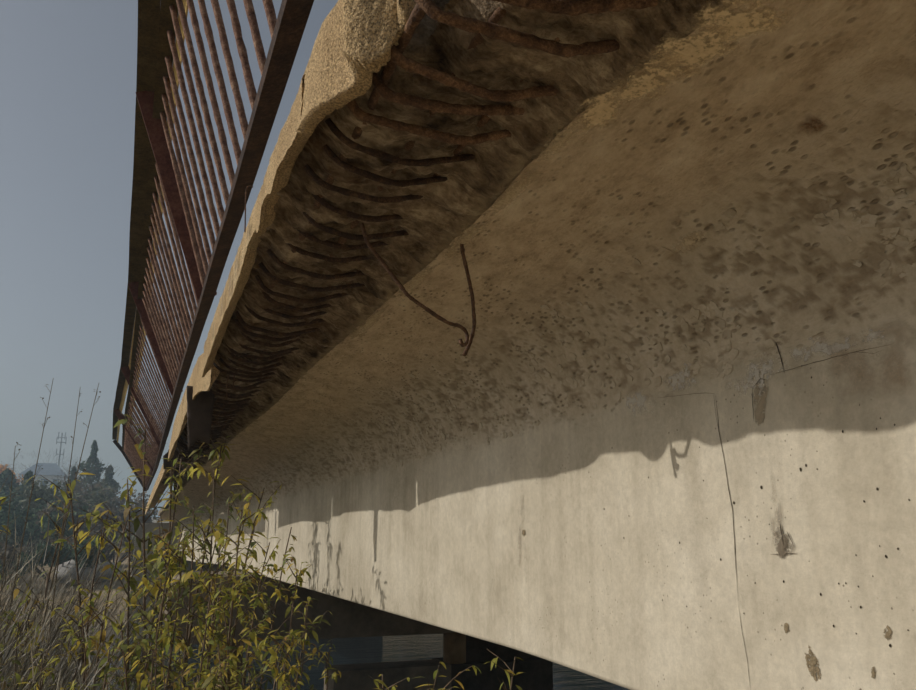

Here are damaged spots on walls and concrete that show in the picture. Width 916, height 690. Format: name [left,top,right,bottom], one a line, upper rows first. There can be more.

spalling [162,0,785,488]
crack [771,341,893,375]
water stain [773,525,795,558]